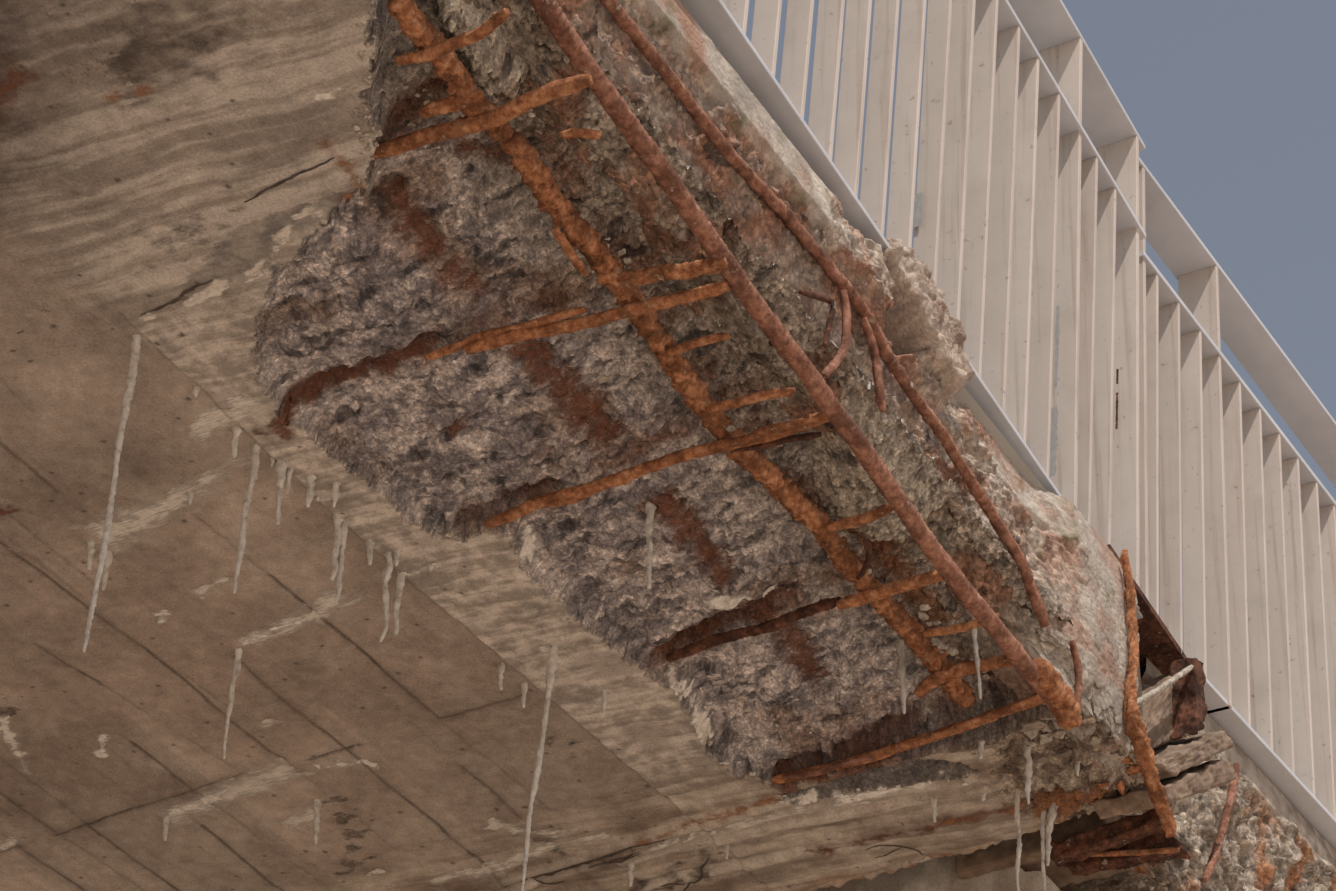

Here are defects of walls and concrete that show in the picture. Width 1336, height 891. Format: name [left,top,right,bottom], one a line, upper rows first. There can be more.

crack [244,157,335,203]
corrosion [508,339,626,450]
spalling [249,0,1180,857]
leakage [83,457,246,554]
leakage [518,525,544,569]
corrosion [639,489,732,590]
leakage [236,590,362,647]
leakage [159,757,378,825]
corrosion [852,784,1119,846]
spalling [1202,763,1240,883]
crack [505,840,665,888]
crack [660,858,709,891]